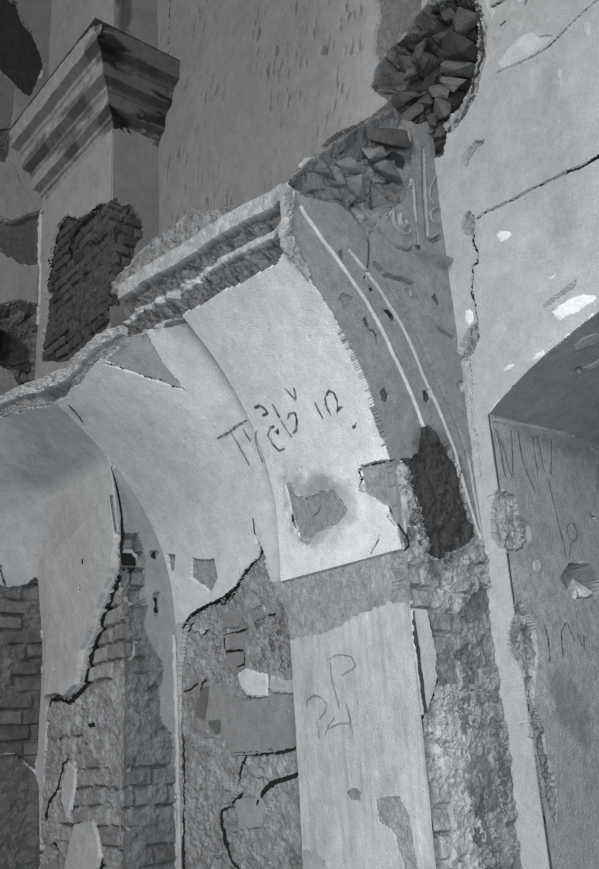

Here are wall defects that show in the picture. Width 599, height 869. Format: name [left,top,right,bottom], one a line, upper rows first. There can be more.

flaking render [375,0,441,61]
crack [501,5,592,72]
spalling [0,0,312,417]
crack [471,154,599,345]
flaking render [494,489,527,556]
flaking render [0,426,522,869]
crack [220,745,298,869]